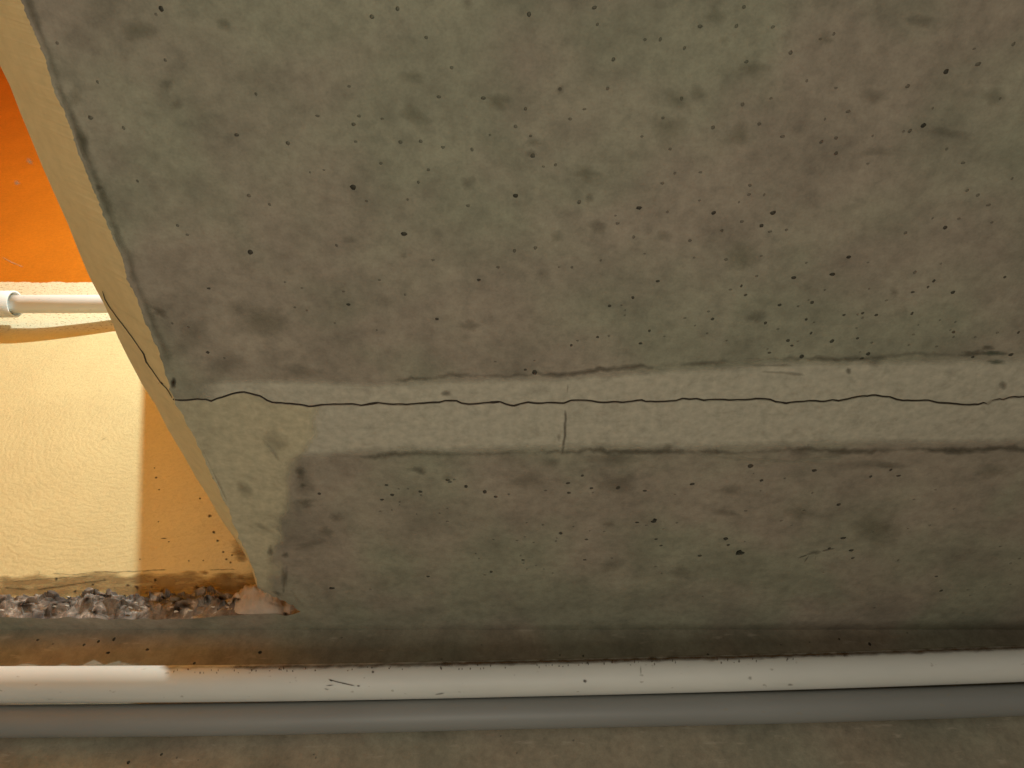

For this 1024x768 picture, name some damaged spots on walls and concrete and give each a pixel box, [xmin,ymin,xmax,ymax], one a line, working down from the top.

crack [102,291,1024,444]
spalling [0,584,301,620]